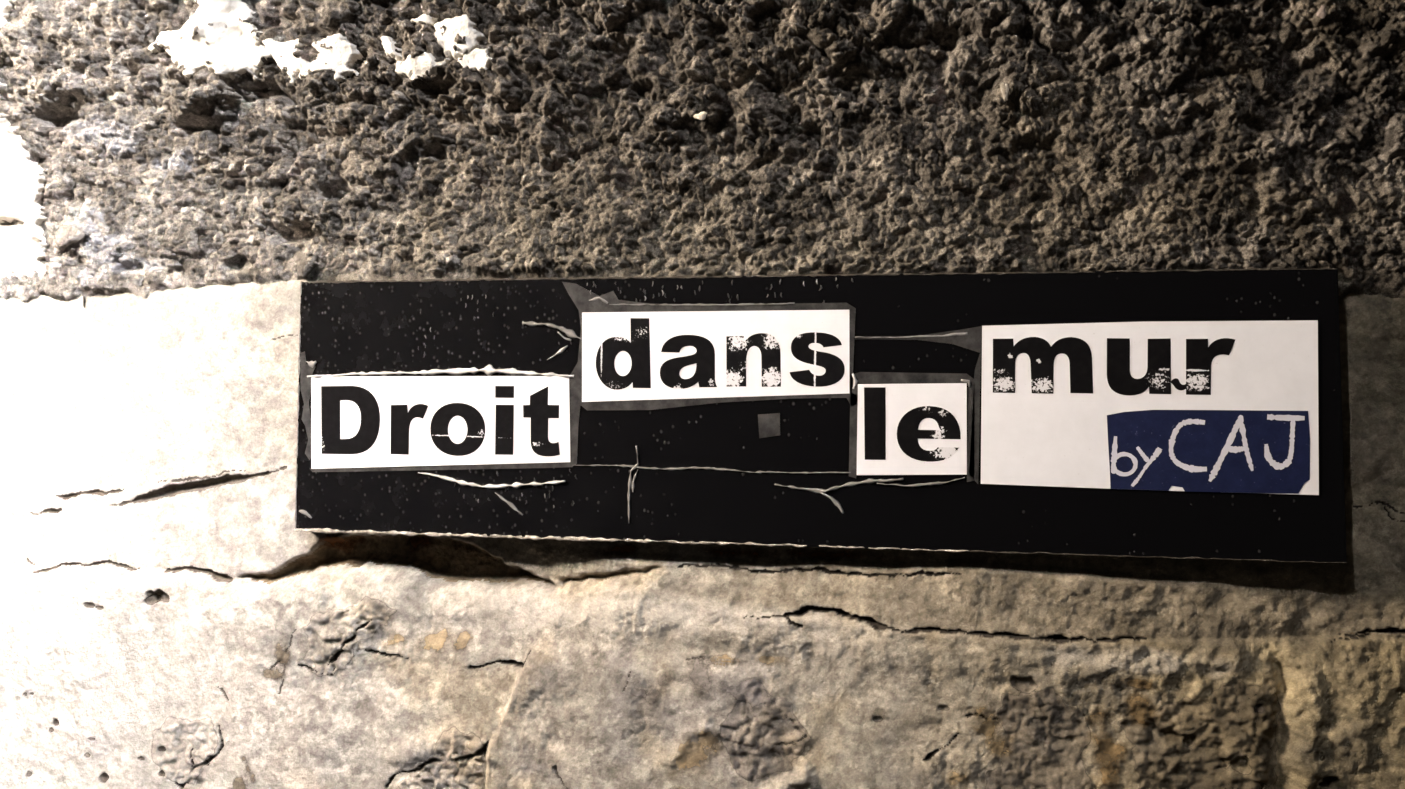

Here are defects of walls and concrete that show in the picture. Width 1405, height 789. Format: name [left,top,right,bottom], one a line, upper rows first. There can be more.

flaking render [0,0,13,65]
flaking render [148,0,365,90]
flaking render [381,14,493,81]
spalling [1000,82,1009,101]
flaking render [0,82,85,279]
flaking render [0,294,85,309]
crack [30,466,287,515]
crack [26,558,233,583]
crack [678,563,961,577]
crack [744,606,1147,644]
crack [270,607,409,694]
crack [469,651,531,669]